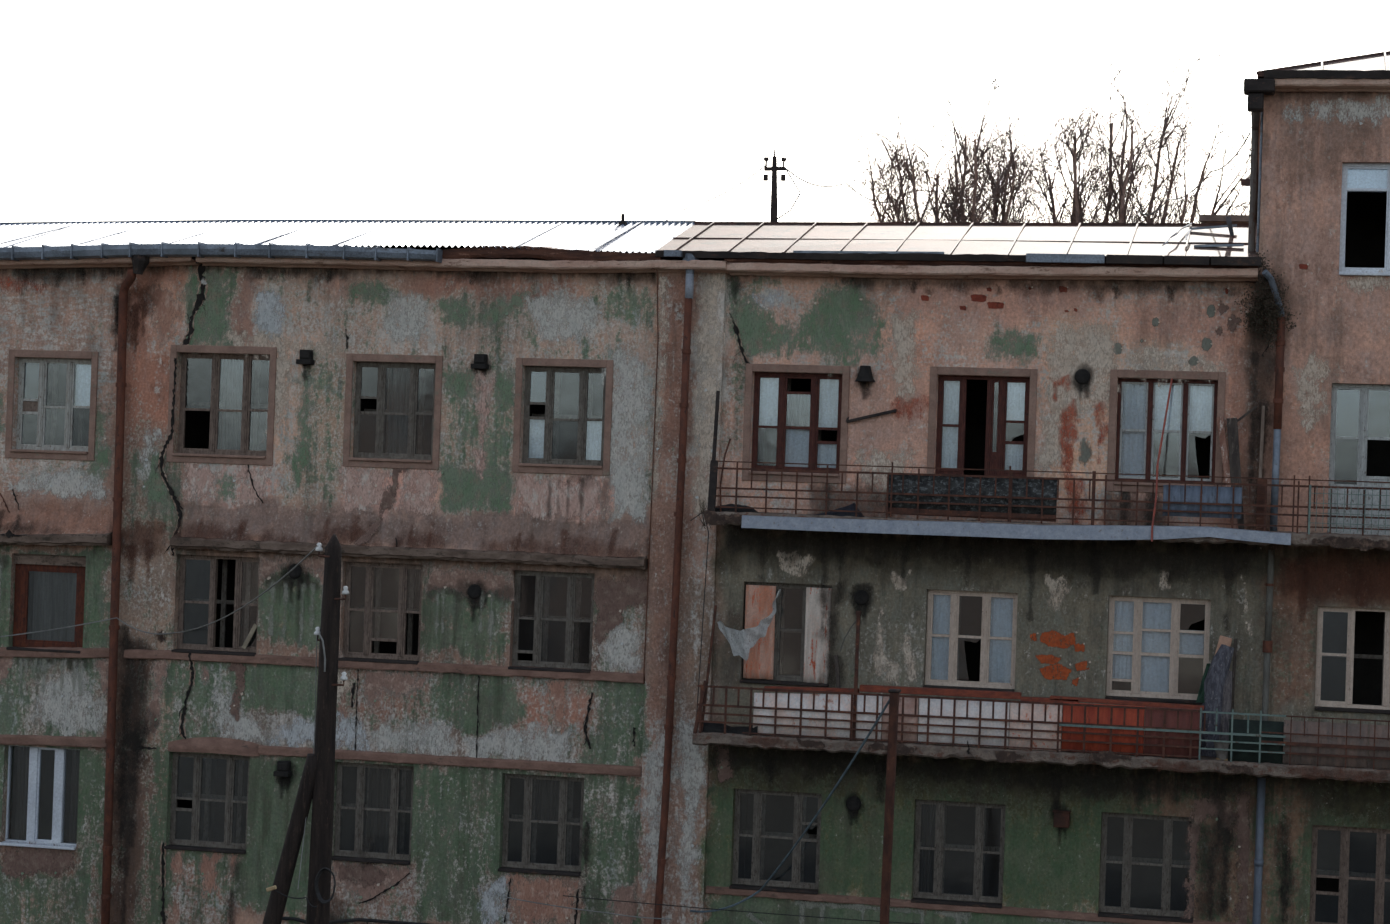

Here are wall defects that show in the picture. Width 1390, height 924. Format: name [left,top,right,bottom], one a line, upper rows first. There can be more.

spalling [959,287,1005,310]
crack [729,312,749,364]
crack [155,262,208,556]
crack [245,465,263,503]
corrosion [1053,375,1085,523]
water stain [730,492,1256,628]
peeling [592,574,647,663]
water stain [19,658,103,736]
crack [133,653,196,750]
crack [583,692,594,749]
spalling [1030,630,1091,686]